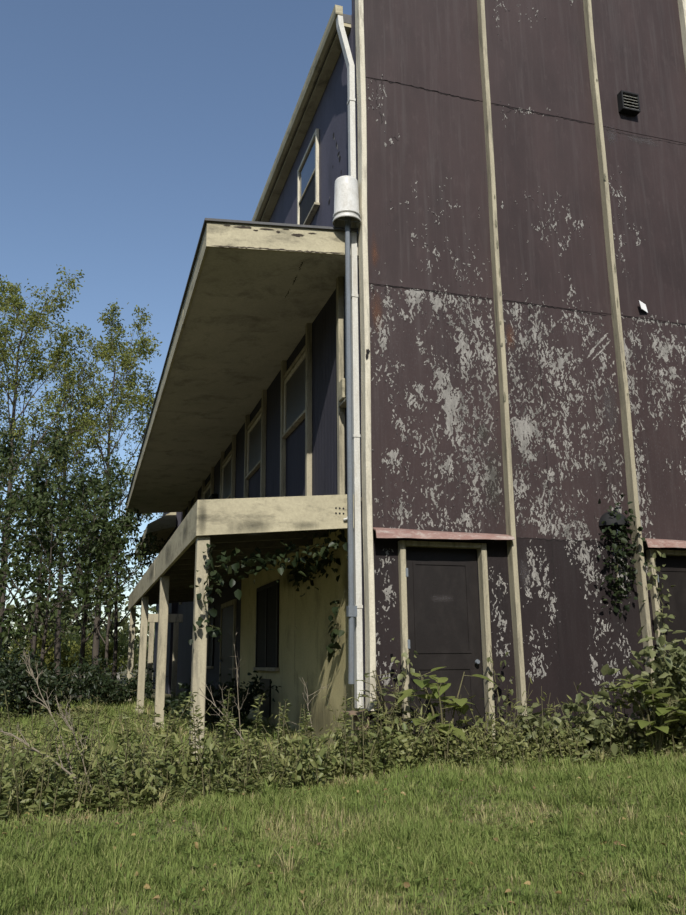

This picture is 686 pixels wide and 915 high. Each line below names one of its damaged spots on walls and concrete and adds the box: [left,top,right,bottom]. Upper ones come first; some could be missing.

peeling [366,172,686,692]